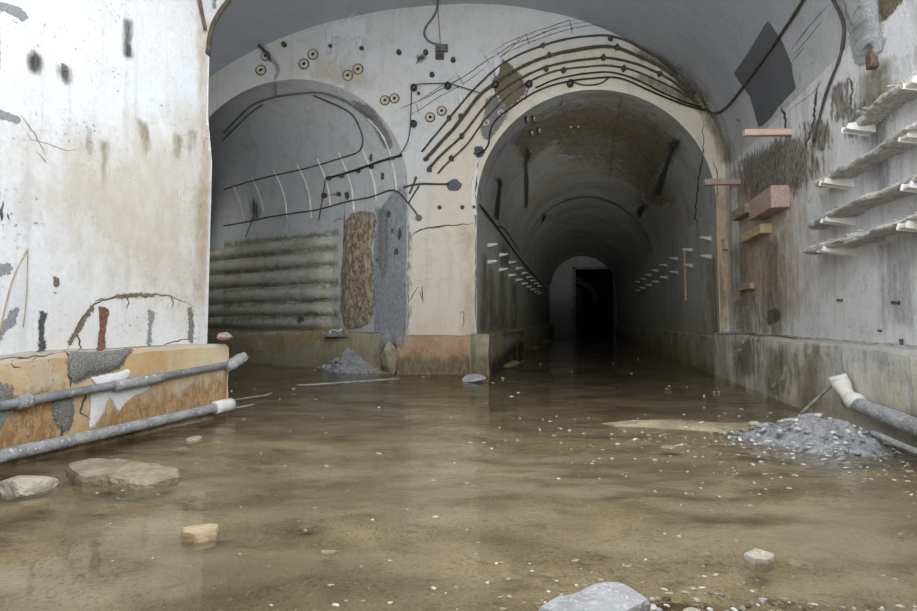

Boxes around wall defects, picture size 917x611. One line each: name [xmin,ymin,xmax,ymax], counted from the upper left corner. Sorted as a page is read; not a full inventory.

spalling [839,0,902,66]
peeling [734,22,795,127]
peeling [0,307,19,340]
peeling [37,311,47,351]
peeling [147,309,155,346]
crack [0,292,200,453]
spalling [67,348,151,429]